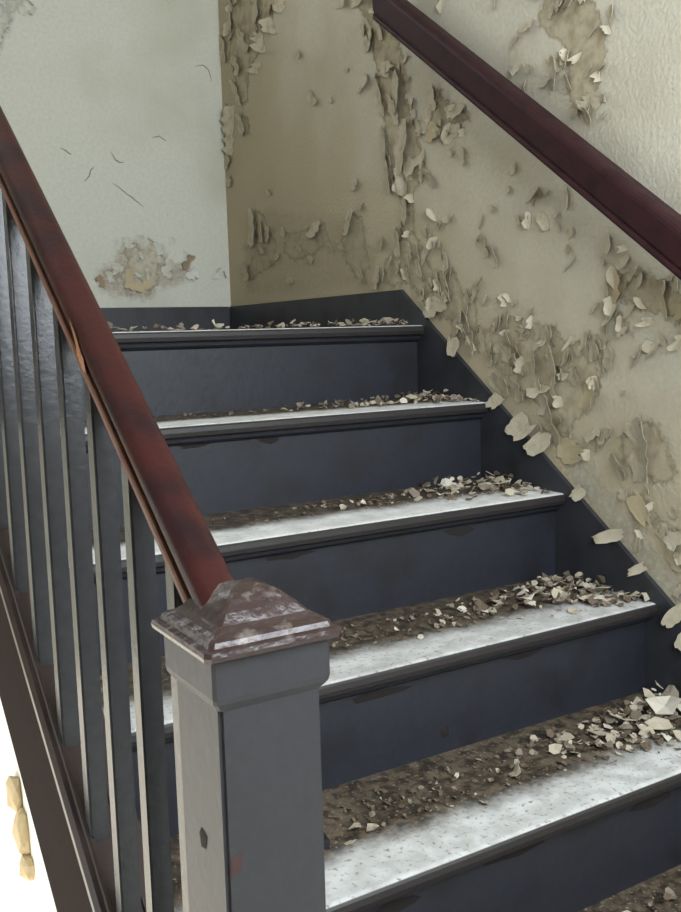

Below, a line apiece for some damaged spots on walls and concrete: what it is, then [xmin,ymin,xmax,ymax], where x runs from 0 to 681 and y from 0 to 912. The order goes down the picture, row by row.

peeling [219,0,286,187]
peeling [96,235,199,295]
peeling [238,0,681,651]